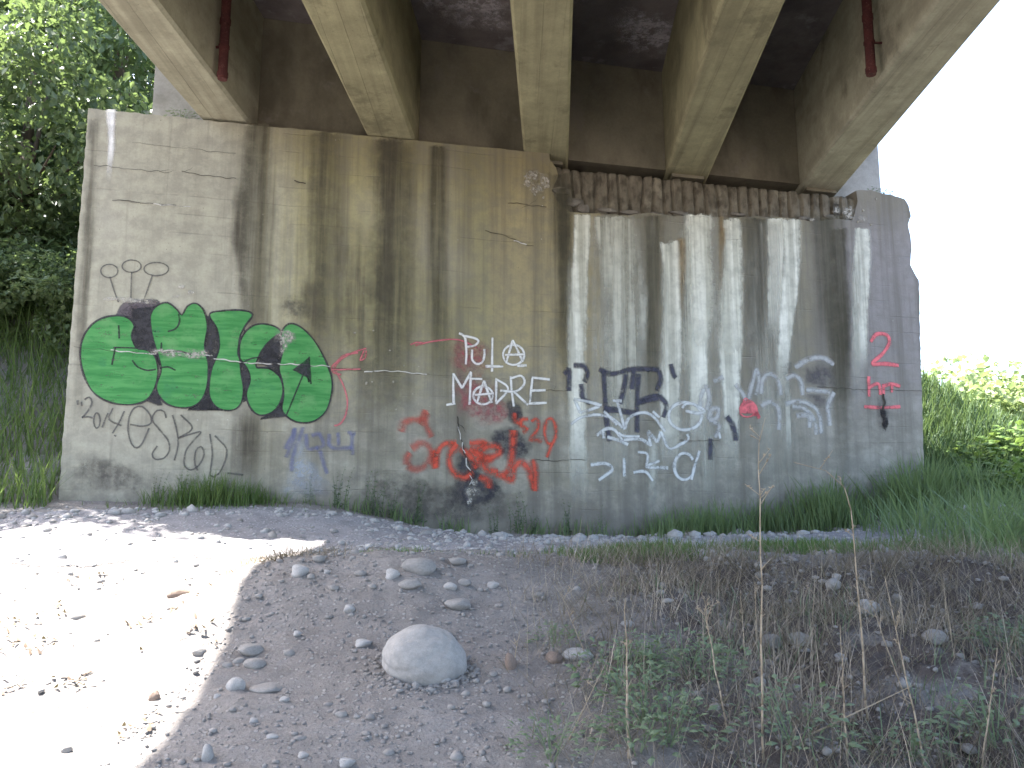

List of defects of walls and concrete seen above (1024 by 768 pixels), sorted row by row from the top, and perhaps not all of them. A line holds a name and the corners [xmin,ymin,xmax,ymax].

damp [236,123,267,252]
damp [286,133,329,326]
crack [84,348,556,391]
damp [374,139,403,360]
damp [431,146,444,321]
crack [457,416,476,498]
damp [557,173,800,482]
spalling [523,167,872,226]
damp [821,216,870,391]